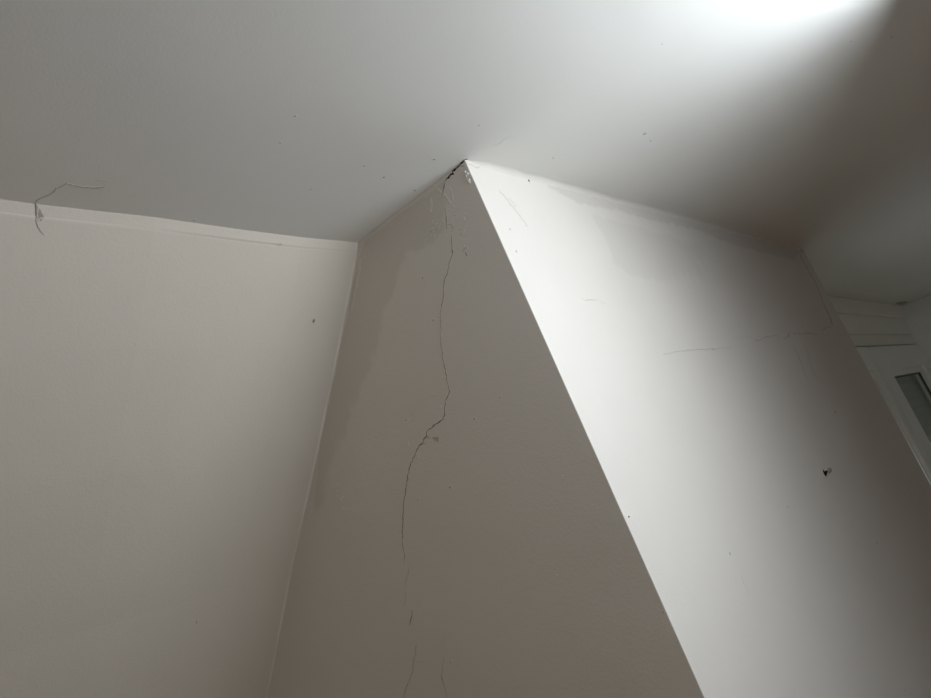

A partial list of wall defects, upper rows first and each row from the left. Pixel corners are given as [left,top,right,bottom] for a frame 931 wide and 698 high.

crack [401,159,480,698]